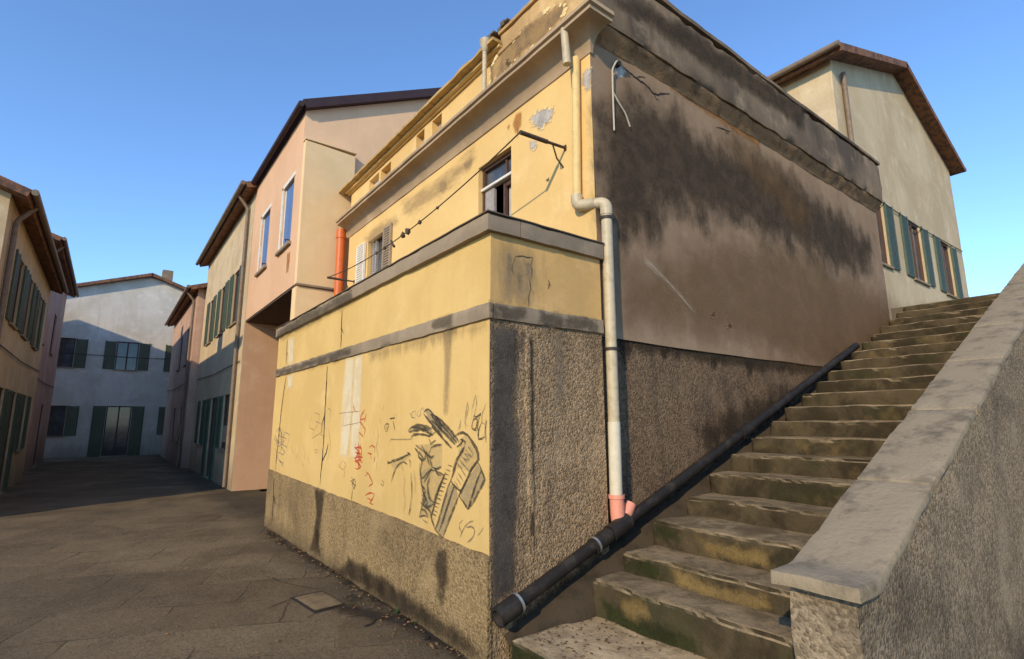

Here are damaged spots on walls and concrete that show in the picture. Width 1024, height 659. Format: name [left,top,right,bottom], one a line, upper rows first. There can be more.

peeling [488,3,569,84]
peeling [528,106,555,151]
peeling [581,66,592,90]
damp [619,2,804,126]
damp [596,93,871,272]
crack [512,255,550,302]
crack [320,375,328,478]
damp [268,490,469,650]